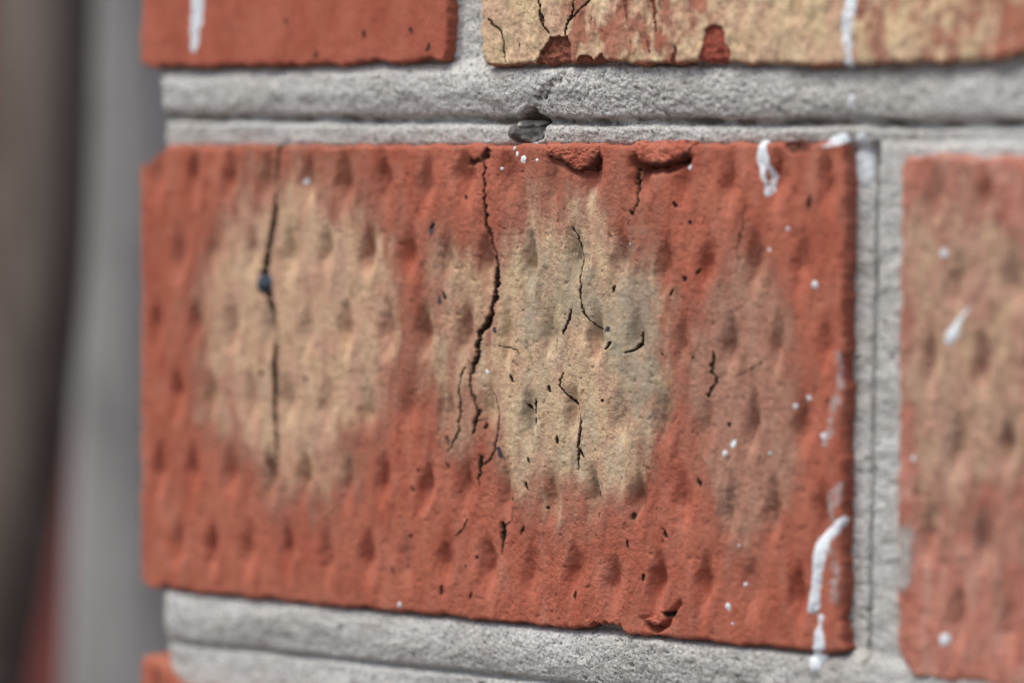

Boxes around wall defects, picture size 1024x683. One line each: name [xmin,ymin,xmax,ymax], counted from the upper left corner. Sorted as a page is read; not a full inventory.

crack [537,0,591,37]
spalling [537,36,612,66]
spalling [698,24,731,64]
leakage [481,0,1024,65]
peeling [546,141,605,173]
peeling [631,139,700,169]
crack [562,227,604,335]
crack [260,148,282,475]
crack [447,157,520,486]
crack [625,332,644,354]
crack [559,372,583,470]
peeling [645,611,678,627]